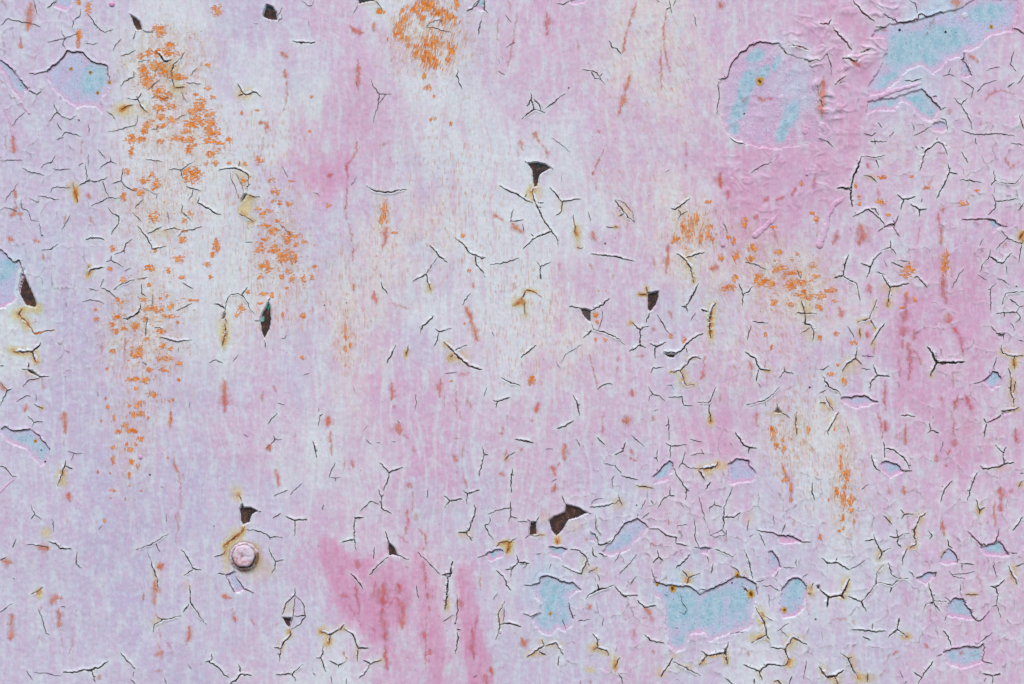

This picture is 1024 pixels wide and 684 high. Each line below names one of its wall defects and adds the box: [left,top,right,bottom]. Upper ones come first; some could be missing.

corrosion [349,0,468,98]
peeling [718,39,821,150]
peeling [867,0,1024,133]
crack [1,2,287,363]
corrosion [93,20,265,501]
corrosion [234,178,316,317]
corrosion [659,200,843,317]
crack [385,316,520,407]
crack [413,52,1024,684]
crack [342,396,461,653]
peeling [528,504,588,559]
peeling [651,567,759,652]